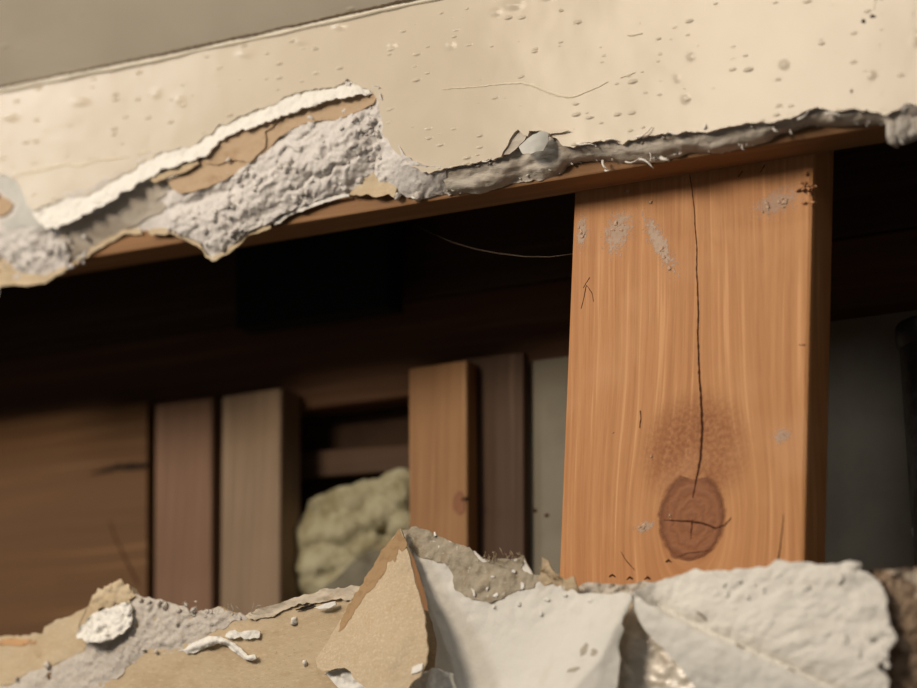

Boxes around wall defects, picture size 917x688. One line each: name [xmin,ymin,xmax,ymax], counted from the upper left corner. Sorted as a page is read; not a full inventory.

spalling [0,80,449,287]
peeling [503,131,549,155]
crack [689,174,703,498]
crack [664,518,731,557]